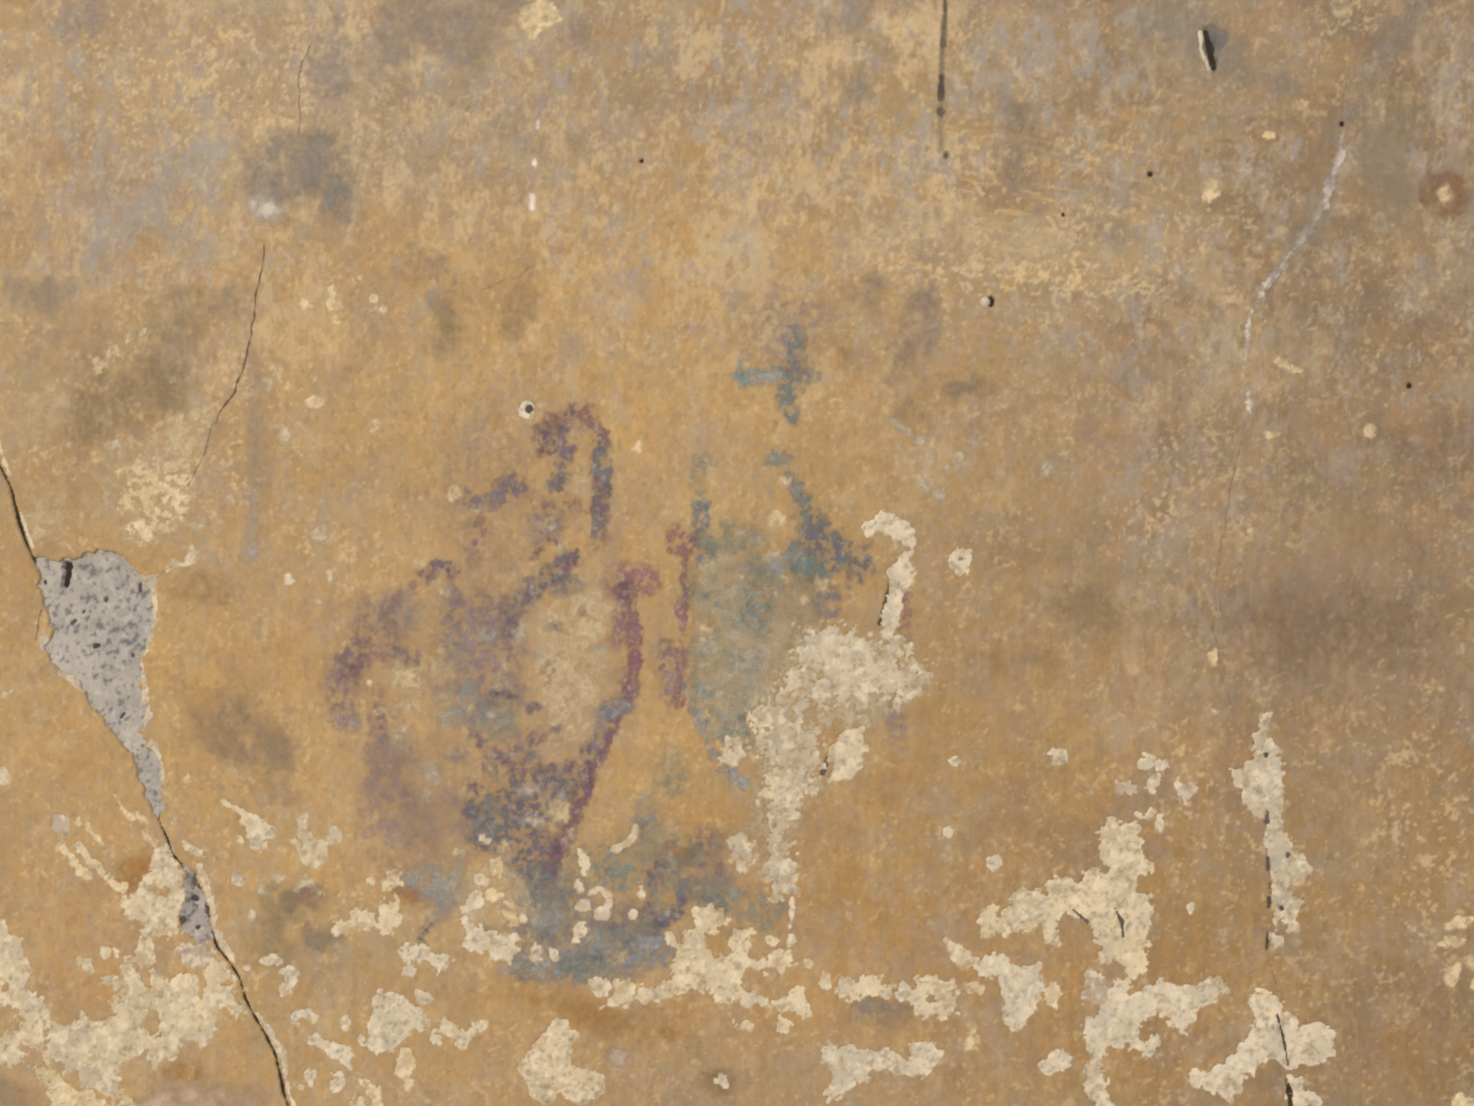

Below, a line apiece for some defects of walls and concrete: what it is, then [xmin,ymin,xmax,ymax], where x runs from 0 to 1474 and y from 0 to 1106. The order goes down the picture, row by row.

crack [297,43,312,134]
hole [1198,25,1229,74]
crack [0,440,37,563]
crack [188,244,265,486]
crack [1212,1,1418,752]
peeling [1363,424,1377,439]
spalling [0,522,645,1106]
peeling [588,509,1229,1106]
peeling [1229,712,1313,950]
crack [158,814,296,1106]
peeling [1188,988,1336,1106]
crack [1284,1078,1293,1106]